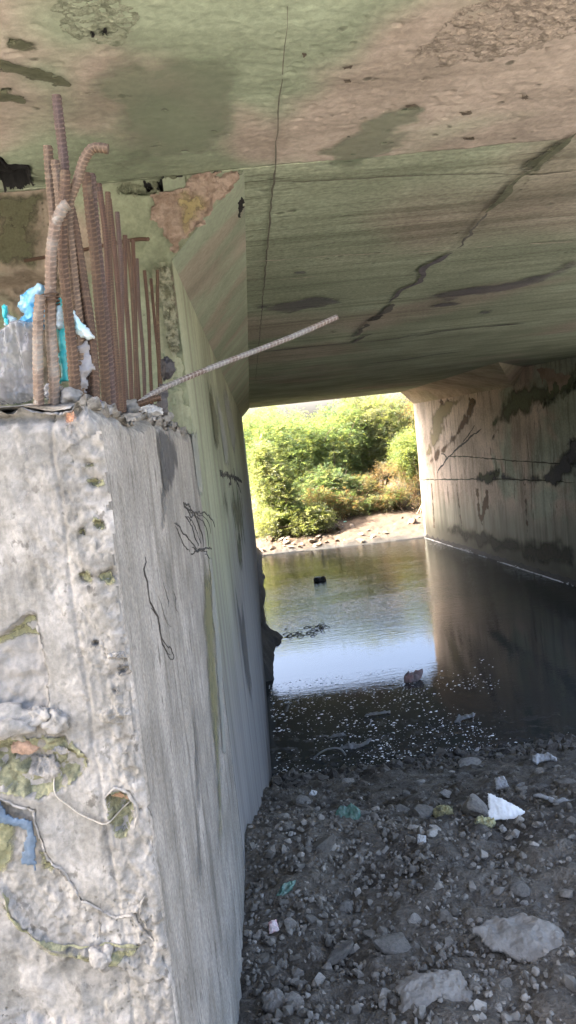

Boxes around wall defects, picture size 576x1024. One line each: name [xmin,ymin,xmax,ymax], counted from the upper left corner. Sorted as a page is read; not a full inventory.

leakage [99,63,233,159]
leakage [321,108,423,166]
spalling [24,94,339,413]
crack [262,133,576,365]
crack [437,425,481,473]
crack [174,502,215,559]
crack [143,557,178,660]
spalling [0,735,87,800]
spalling [103,787,140,839]